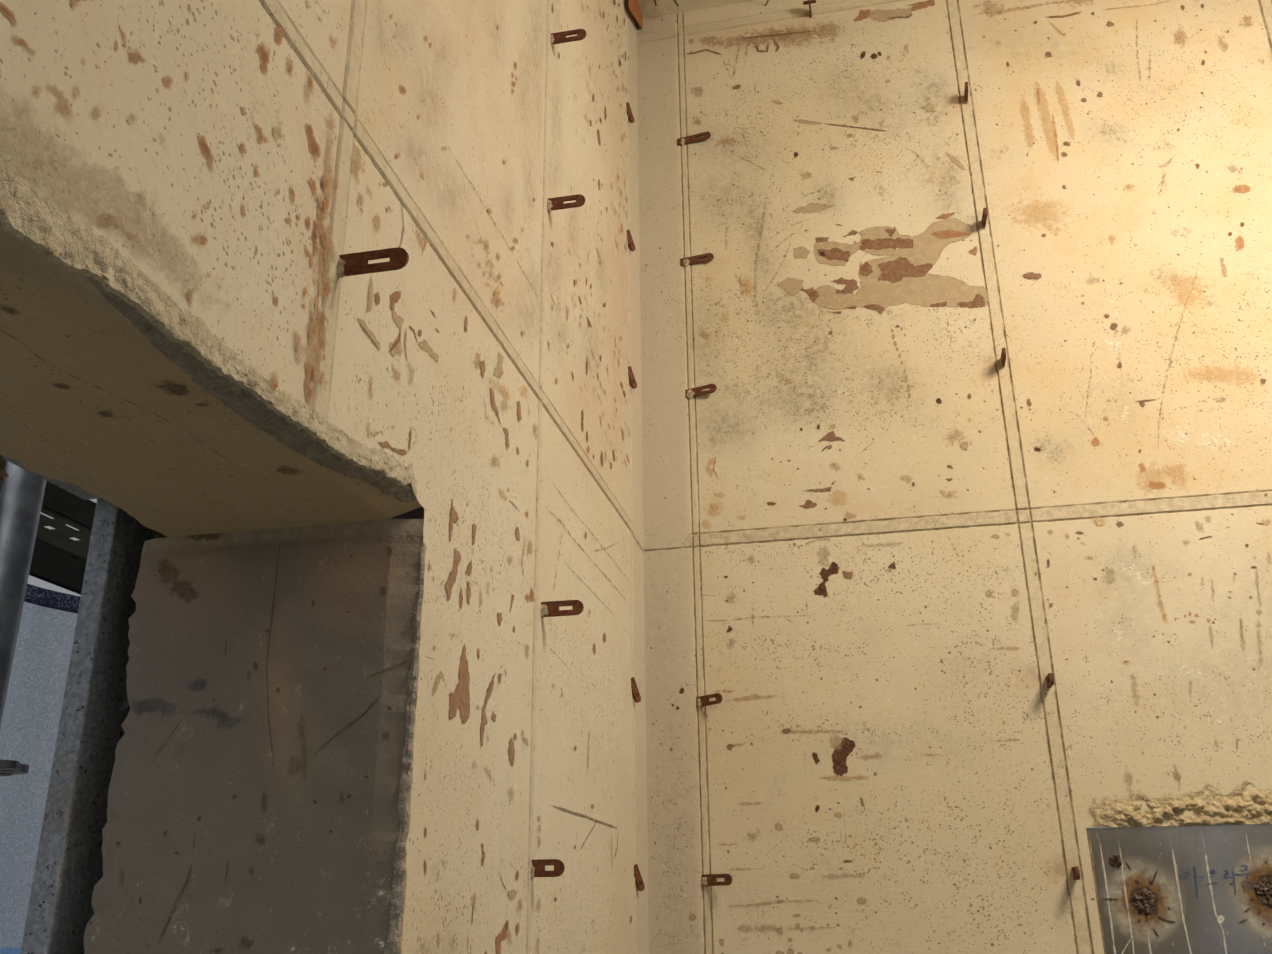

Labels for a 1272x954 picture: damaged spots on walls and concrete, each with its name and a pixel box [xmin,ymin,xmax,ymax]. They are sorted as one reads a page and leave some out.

corrosion [240,106,281,153]
peeling [792,203,834,213]
corrosion [277,120,338,417]
peeling [777,212,989,321]
spalling [0,156,417,501]
peeling [358,276,439,380]
peeling [508,527,532,573]
spalling [384,499,489,954]
peeling [433,644,502,747]
spalling [1089,769,1272,828]